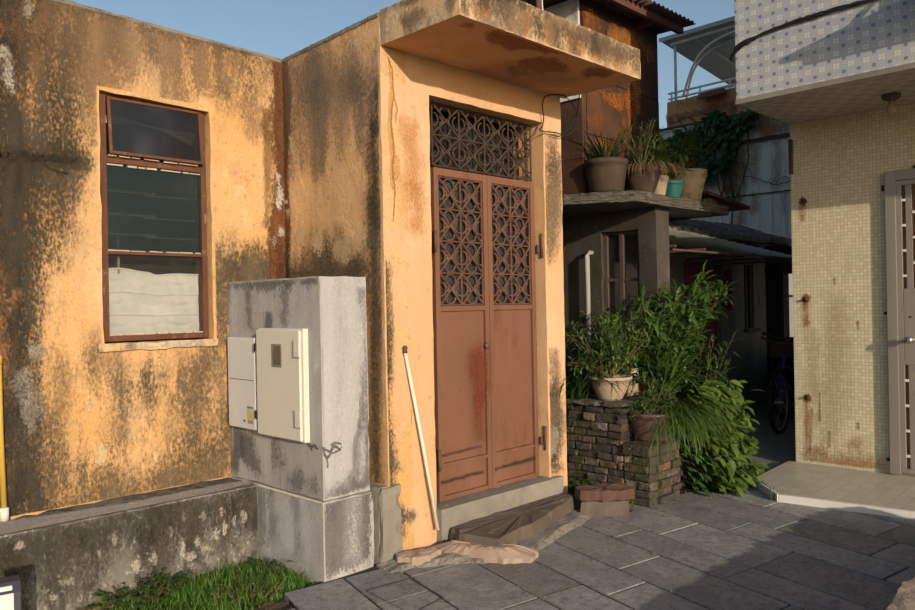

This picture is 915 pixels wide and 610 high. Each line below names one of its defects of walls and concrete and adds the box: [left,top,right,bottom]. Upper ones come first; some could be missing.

peeling [0,45,15,94]
damp [446,0,641,74]
corrosion [573,4,654,65]
crack [0,149,79,174]
corrosion [267,61,295,280]
peeling [276,173,293,216]
peeling [289,135,297,156]
damp [545,138,562,262]
corrosion [594,80,647,156]
damp [0,0,401,610]
corrosion [803,393,877,468]
damp [401,506,416,535]